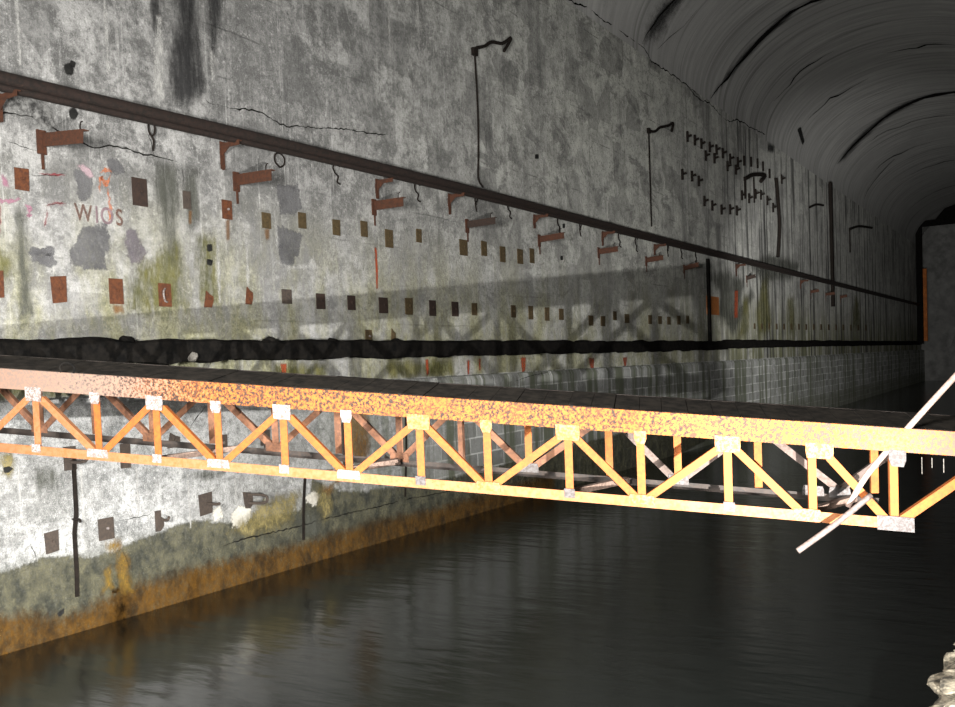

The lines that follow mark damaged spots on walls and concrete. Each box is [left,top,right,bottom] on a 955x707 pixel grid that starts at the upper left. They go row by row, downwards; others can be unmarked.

leakage [650,0,680,33]
leakage [151,0,220,104]
crack [205,99,385,143]
crack [82,136,184,186]
rust [351,414,369,457]
rust [0,478,554,656]
leakage [0,433,706,651]